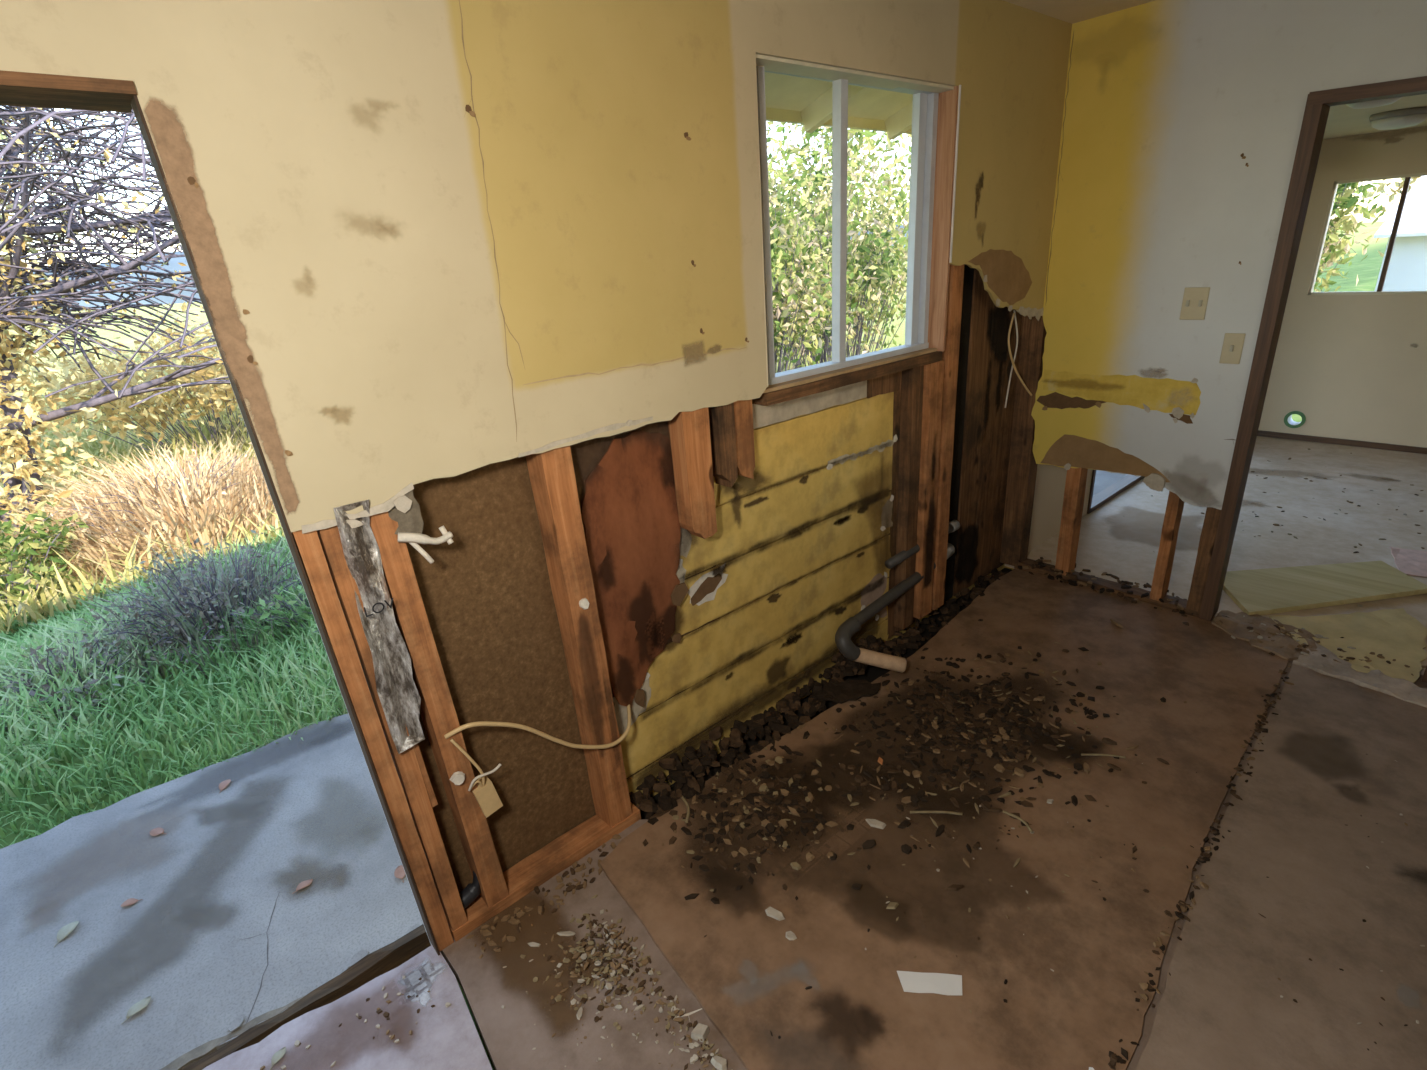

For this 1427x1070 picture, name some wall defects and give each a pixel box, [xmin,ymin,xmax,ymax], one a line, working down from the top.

crack [459,0,747,442]
peeling [684,332,720,364]
peeling [1043,369,1201,424]
leakage [577,421,671,476]
spalling [676,527,728,606]
peeling [613,672,651,735]
peeling [865,819,886,829]
leakage [696,679,1099,907]
leakage [67,722,353,1027]
crack [236,892,280,1022]
spalling [160,995,306,1070]
leakage [820,995,882,1053]